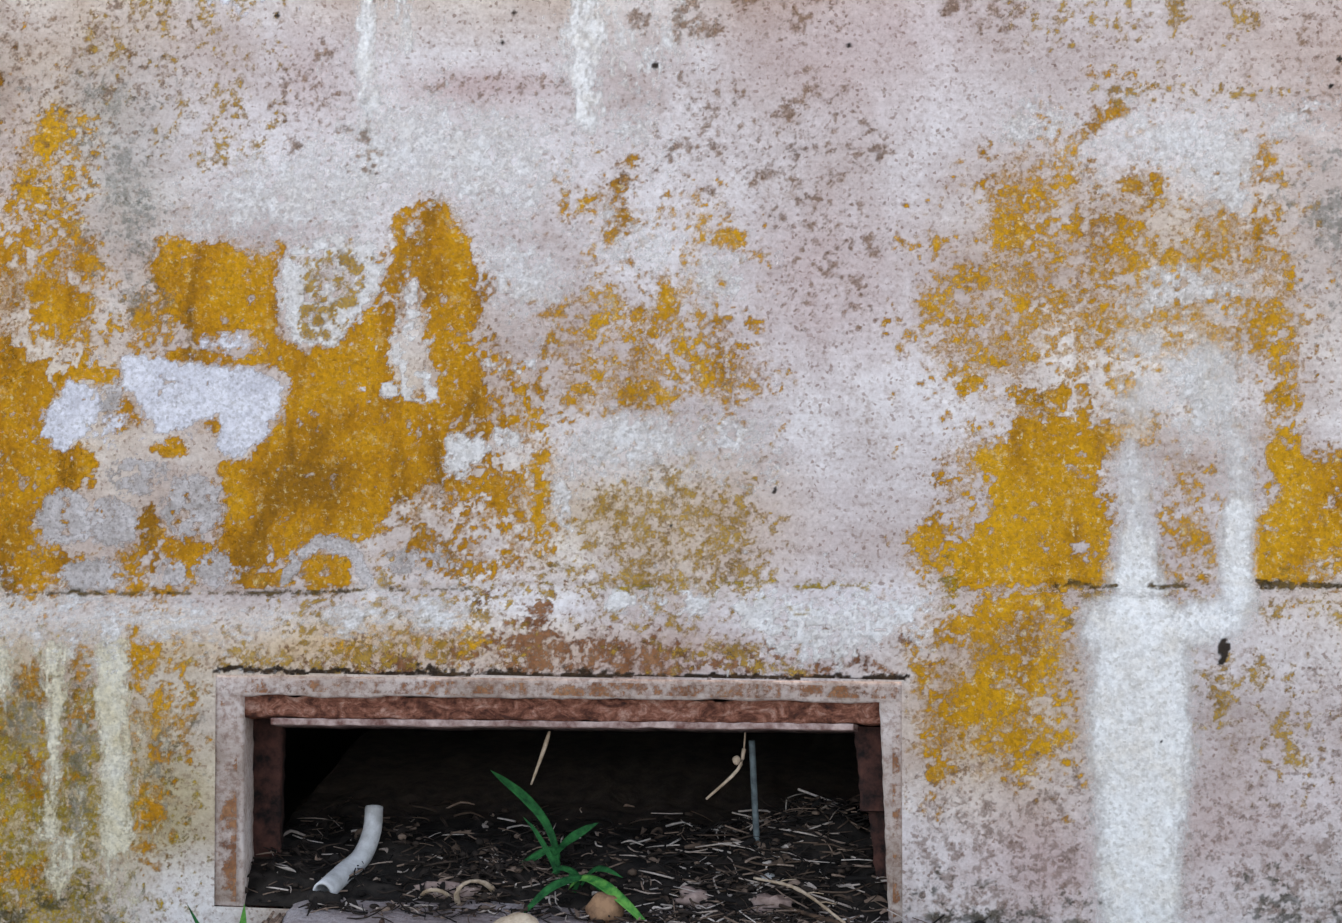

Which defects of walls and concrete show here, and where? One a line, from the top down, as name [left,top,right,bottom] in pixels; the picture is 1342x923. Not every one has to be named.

peeling [40,332,291,458]